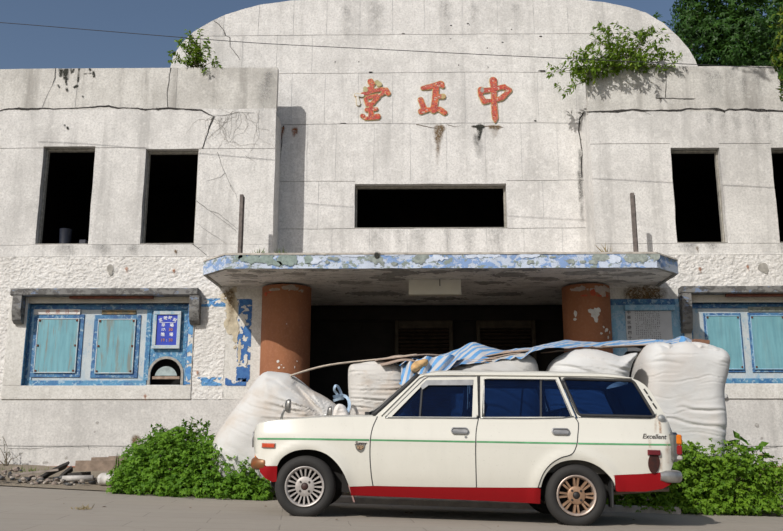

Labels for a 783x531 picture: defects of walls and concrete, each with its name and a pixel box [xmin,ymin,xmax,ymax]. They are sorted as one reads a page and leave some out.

leakage [58,68,95,91]
crack [0,68,246,202]
crack [578,71,783,175]
peeling [217,252,660,368]